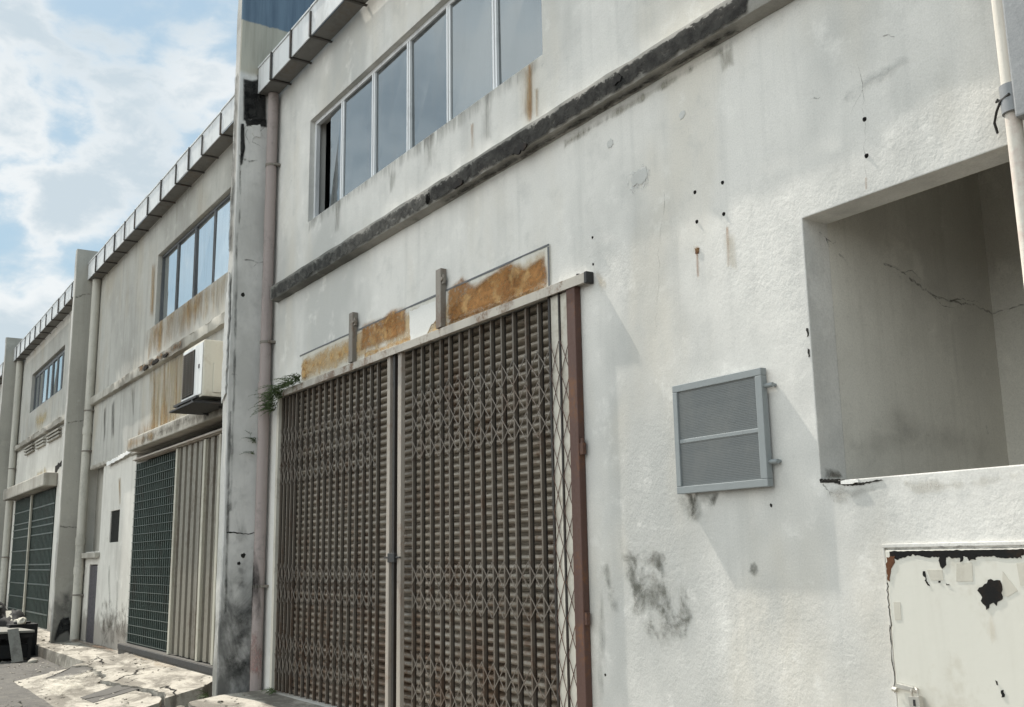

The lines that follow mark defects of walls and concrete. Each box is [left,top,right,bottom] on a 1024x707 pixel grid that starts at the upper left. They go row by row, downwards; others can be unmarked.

damp [229,76,267,255]
corrosion [433,260,547,331]
corrosion [302,310,410,378]